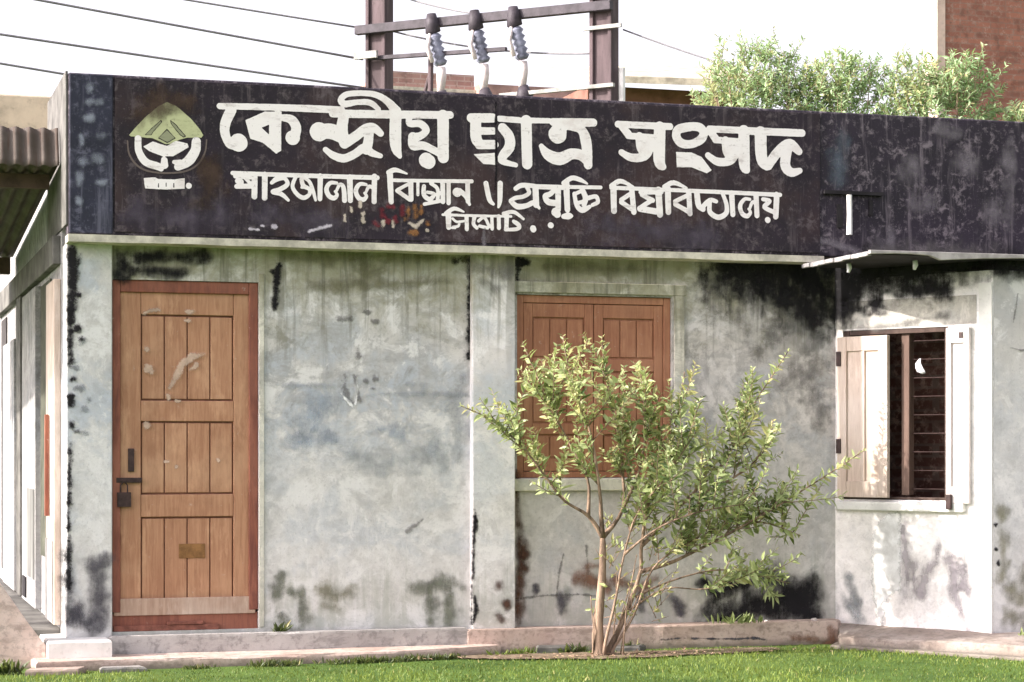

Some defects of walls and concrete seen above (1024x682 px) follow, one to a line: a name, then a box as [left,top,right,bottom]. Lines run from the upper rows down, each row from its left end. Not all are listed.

water stain [112,249,211,283]
water stain [269,256,292,311]
water stain [312,253,428,291]
water stain [699,239,1024,343]
water stain [64,245,90,412]
water stain [58,422,112,633]
water stain [272,571,308,627]
water stain [410,575,454,626]
water stain [557,593,568,613]
water stain [696,568,823,622]
water stain [845,574,862,622]
water stain [900,525,970,613]